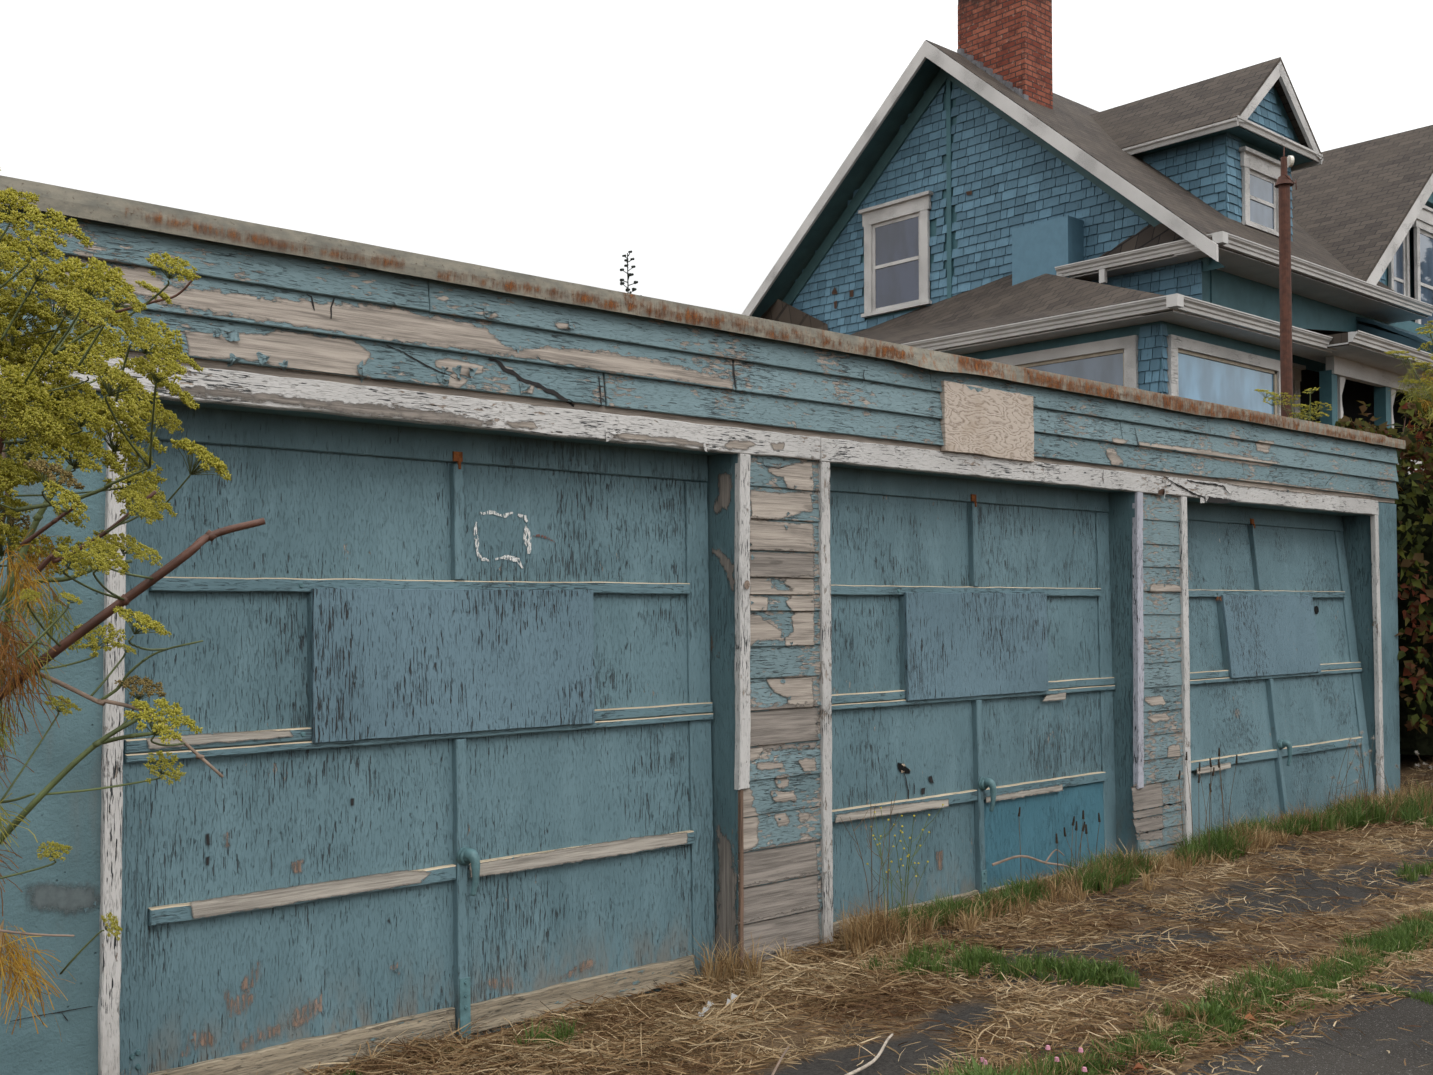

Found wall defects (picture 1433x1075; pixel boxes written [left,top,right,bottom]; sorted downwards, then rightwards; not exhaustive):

rust [154,215,306,252]
peeling [112,259,734,394]
rust [482,280,841,350]
peeling [153,385,538,429]
rust [1025,368,1299,430]
peeling [1148,583,1181,593]
peeling [1144,696,1170,723]
peeling [1130,782,1164,841]